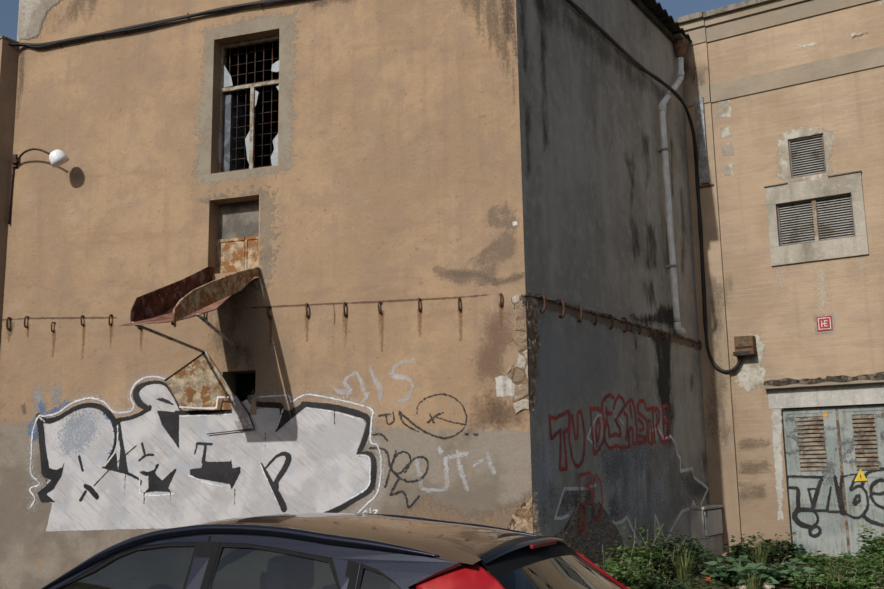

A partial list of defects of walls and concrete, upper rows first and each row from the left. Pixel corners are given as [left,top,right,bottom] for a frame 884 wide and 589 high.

rust [164,351,257,434]
flaking render [507,293,700,414]
damp [633,284,676,447]
flaking render [403,493,540,535]
flaking render [553,502,626,569]